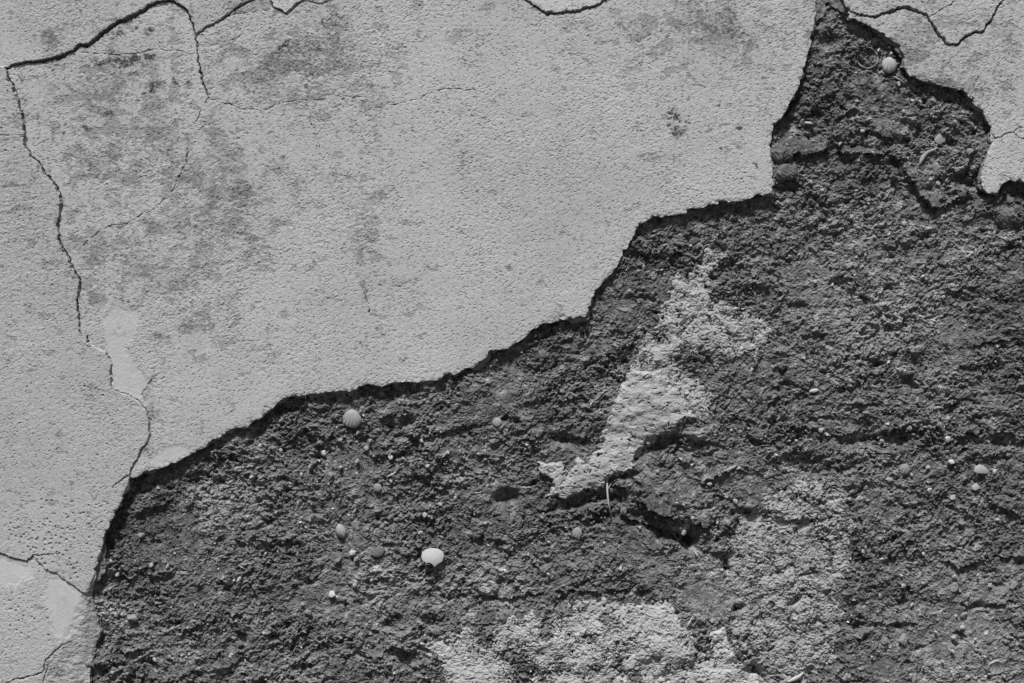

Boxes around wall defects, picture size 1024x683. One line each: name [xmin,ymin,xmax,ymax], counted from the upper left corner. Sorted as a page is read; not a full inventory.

crack [146,1,273,120]
peeling [834,306,903,359]
peeling [193,474,265,536]
spalling [788,640,798,667]